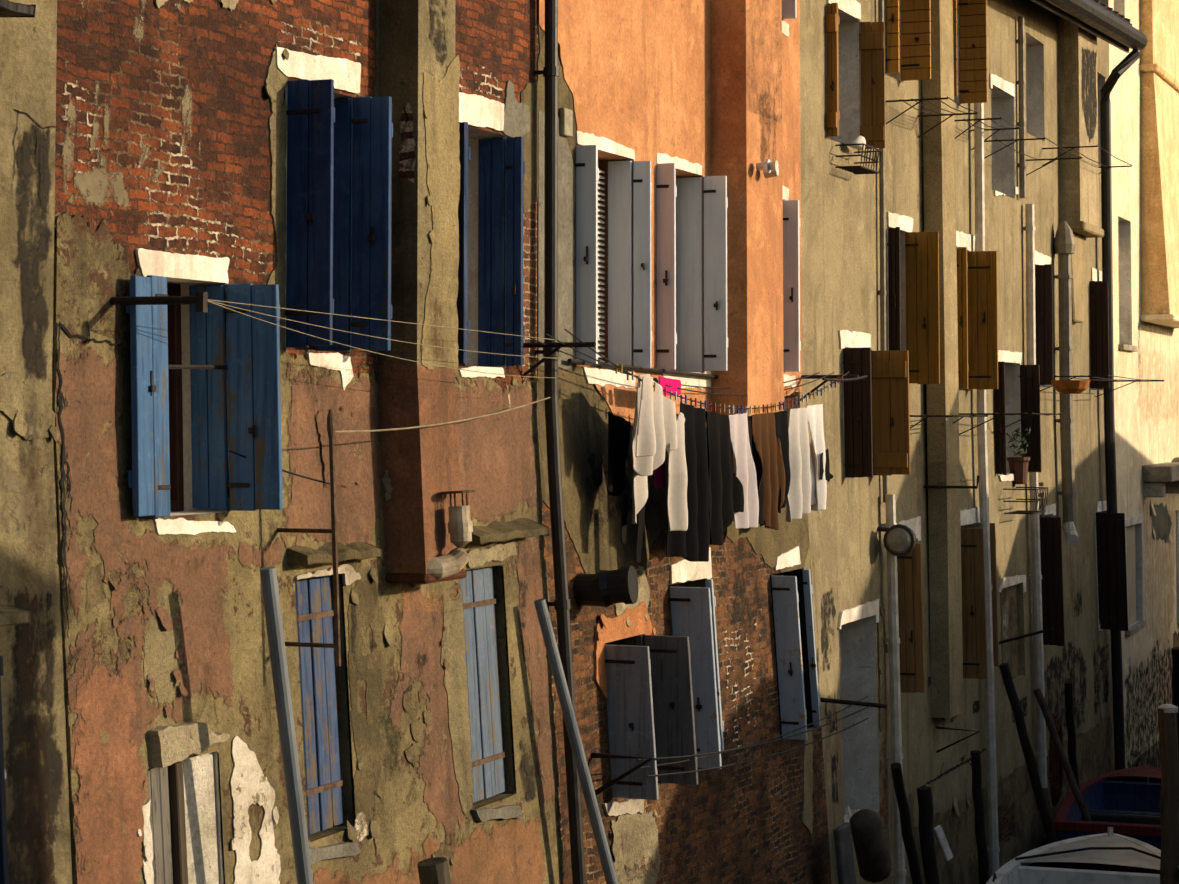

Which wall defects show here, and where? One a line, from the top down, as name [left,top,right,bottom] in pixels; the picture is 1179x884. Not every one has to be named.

flaking render [221,0,238,12]
flaking render [264,44,289,117]
leakage [429,0,447,65]
leakage [15,125,52,380]
flaking render [399,55,460,370]
crack [57,312,124,639]
leakage [6,587,64,884]
flaking render [118,607,188,717]
flaking render [346,569,394,846]
flaking render [594,565,656,699]
peeling [137,799,154,884]
peeling [230,736,281,884]